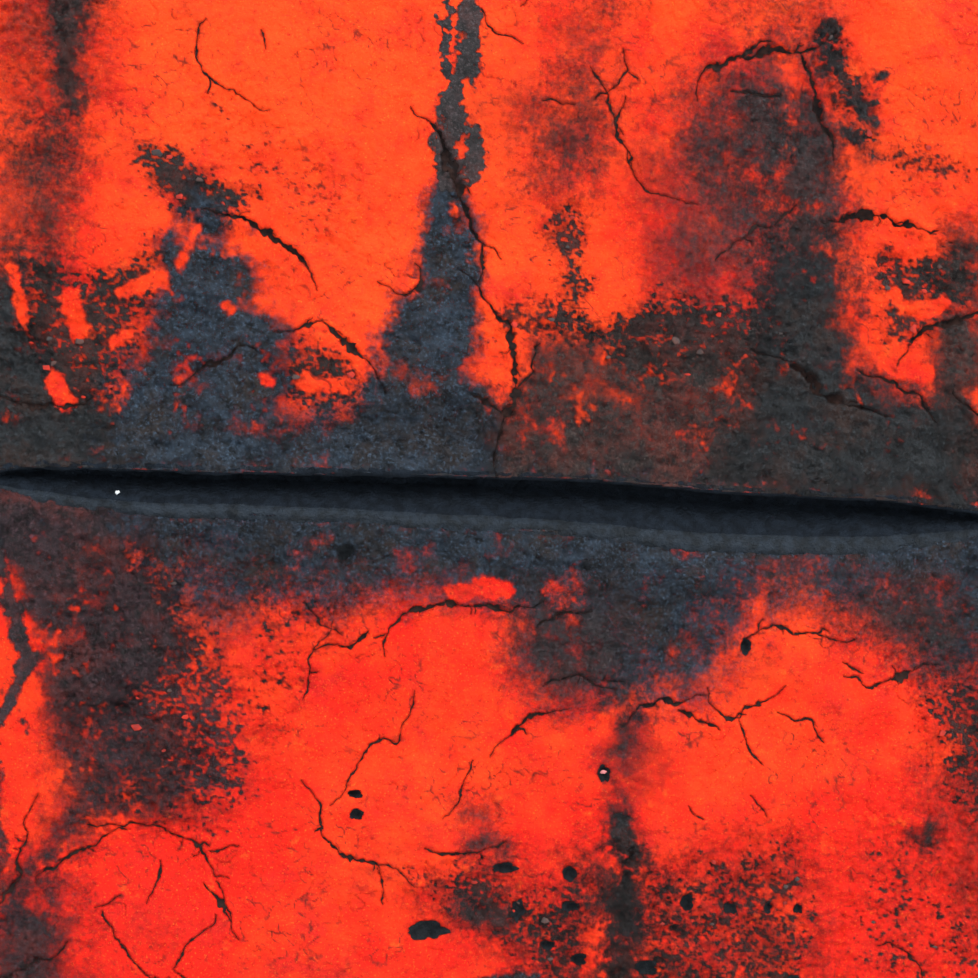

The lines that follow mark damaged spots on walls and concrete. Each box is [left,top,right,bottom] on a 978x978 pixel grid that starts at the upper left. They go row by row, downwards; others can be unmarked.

water stain [434,0,455,80]
crack [696,32,836,161]
water stain [768,92,844,310]
crack [0,795,239,978]
crack [301,690,415,904]
crack [303,600,591,698]
crack [424,841,507,861]
crack [442,708,570,819]
water stain [143,522,977,706]
crack [545,674,625,690]
crack [626,686,824,765]
crack [740,619,944,689]